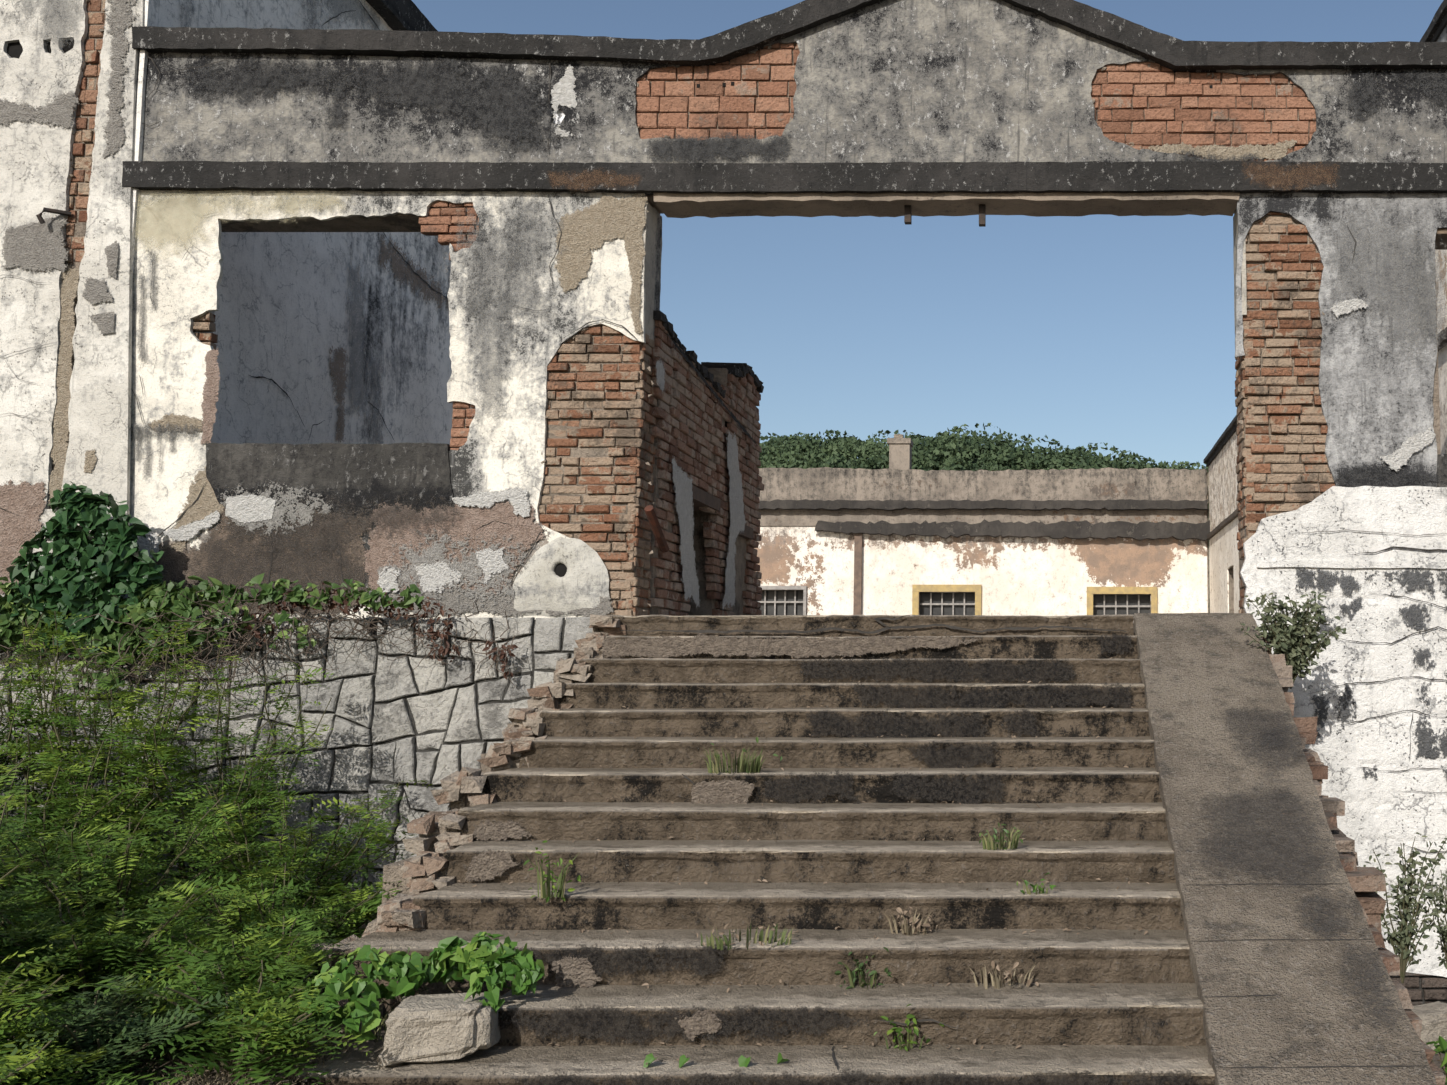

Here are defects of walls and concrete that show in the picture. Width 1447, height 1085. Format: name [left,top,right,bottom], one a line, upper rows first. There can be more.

water stain [184,54,557,153]
flaking render [636,43,800,140]
flaking render [1091,62,1316,161]
flaking render [0,0,140,594]
flaking render [137,193,665,619]
flaking render [1238,212,1369,538]
flaking render [672,457,700,608]
flaking render [722,430,746,609]
water stain [1200,709,1349,937]